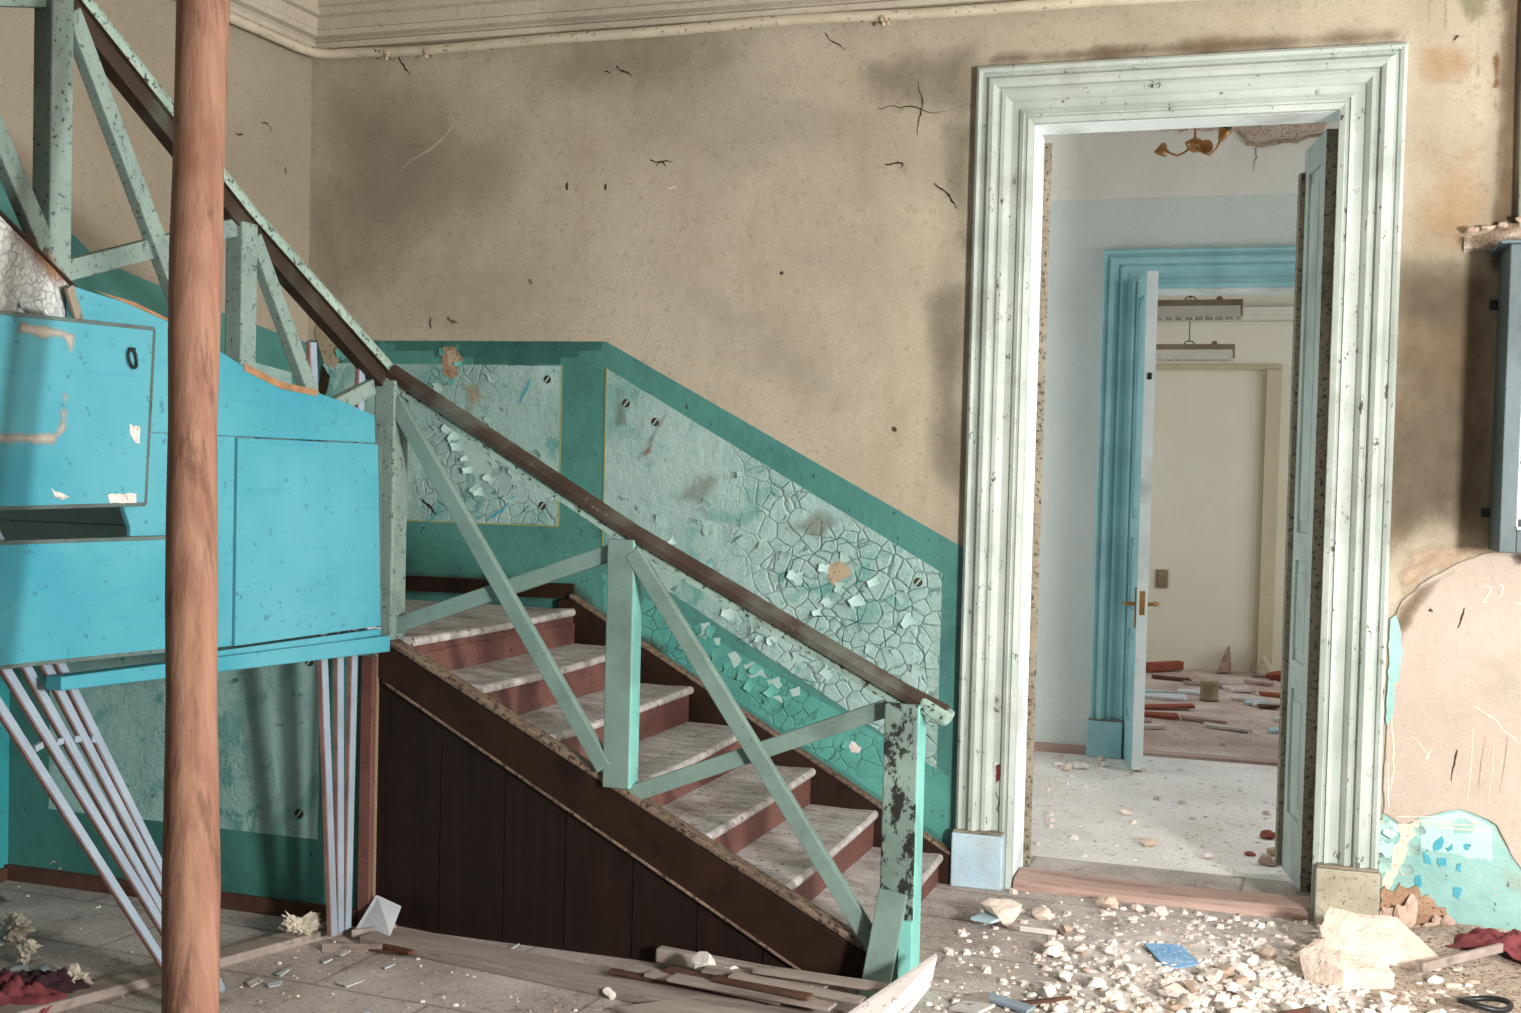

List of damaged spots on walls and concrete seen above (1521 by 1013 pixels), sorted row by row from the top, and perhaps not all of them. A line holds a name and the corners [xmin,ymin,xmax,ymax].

crack [880,81,945,169]
flaking render [1159,122,1328,169]
crack [935,183,958,209]
flaking render [431,344,463,393]
peeling [431,424,521,521]
peeling [655,514,676,545]
peeling [758,537,928,681]
peeling [694,608,833,707]
peeling [1386,615,1403,725]
peeling [842,739,861,753]
peeling [1378,806,1521,931]